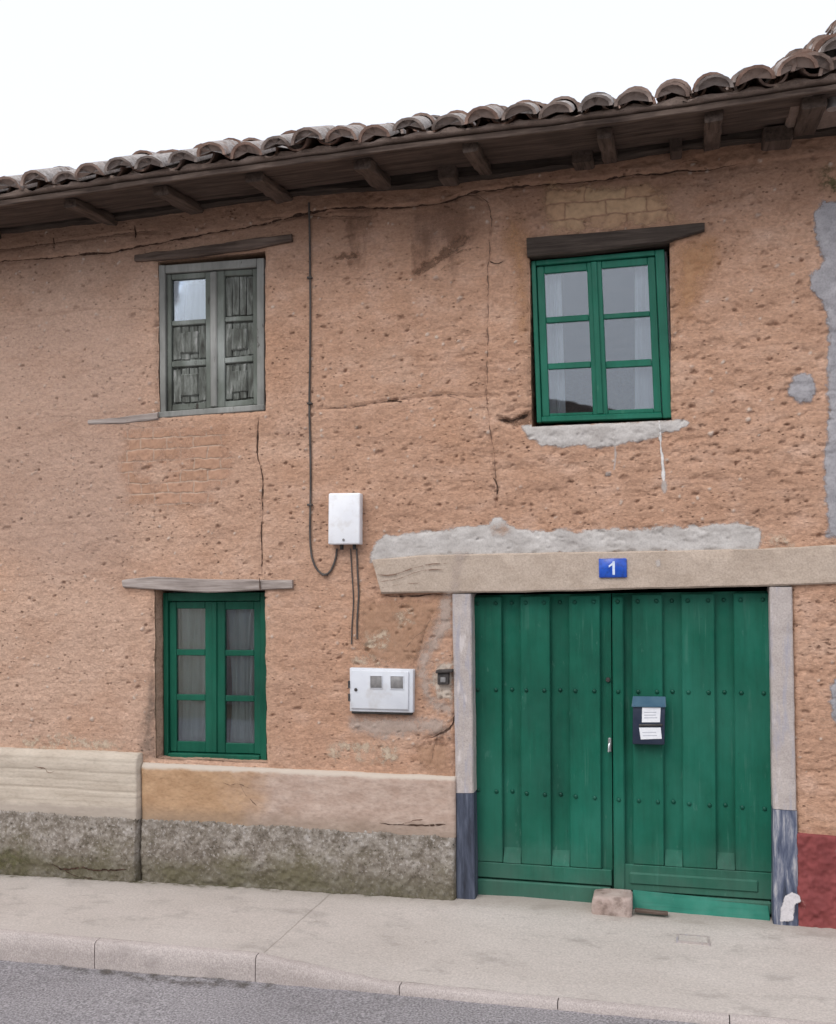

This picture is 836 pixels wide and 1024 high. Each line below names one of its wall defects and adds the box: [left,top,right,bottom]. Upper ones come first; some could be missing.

crack [0,160,742,496]
crack [256,420,264,590]
crack [382,818,446,826]